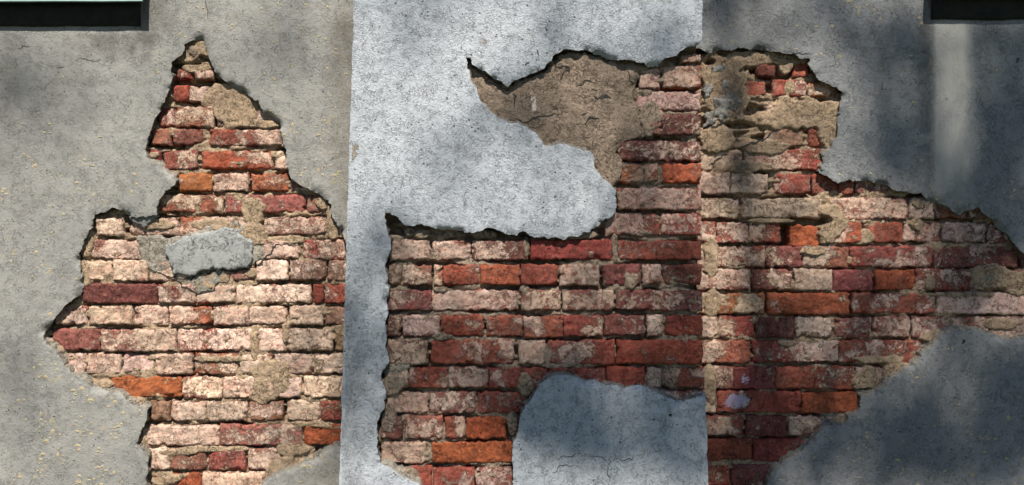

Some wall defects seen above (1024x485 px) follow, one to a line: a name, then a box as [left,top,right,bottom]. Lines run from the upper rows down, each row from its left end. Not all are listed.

spalling [43,40,347,485]
spalling [377,45,1024,485]